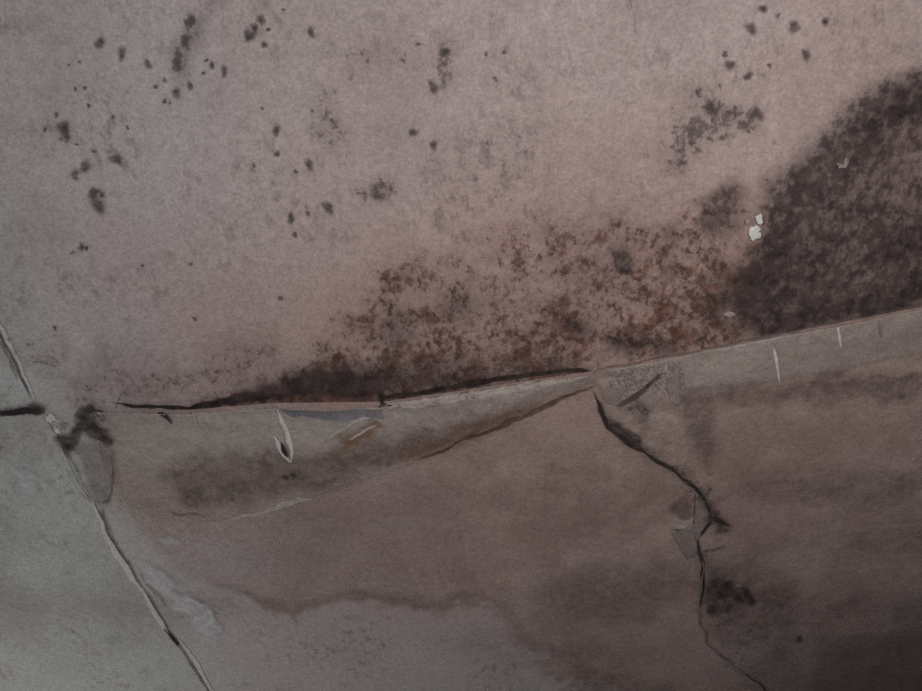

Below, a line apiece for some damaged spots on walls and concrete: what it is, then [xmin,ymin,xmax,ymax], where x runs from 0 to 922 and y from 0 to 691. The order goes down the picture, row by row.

damp [174,15,196,71]
damp [430,44,453,93]
damp [55,112,79,146]
damp [89,188,104,212]
damp [173,71,922,691]
crack [0,324,213,691]
crack [117,306,914,691]
damp [141,563,220,643]